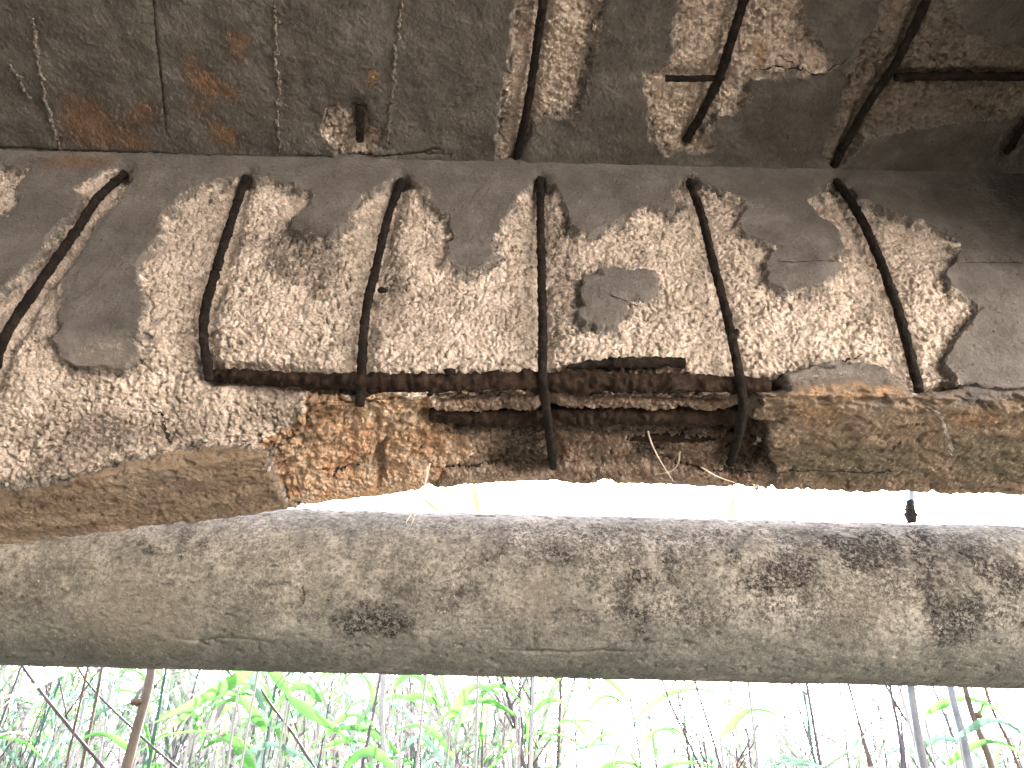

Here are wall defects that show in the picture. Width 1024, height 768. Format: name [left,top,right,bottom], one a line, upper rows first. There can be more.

spalling [494,0,609,161]
crack [752,55,848,76]
spalling [641,0,1024,168]
spalling [319,100,393,159]
spalling [0,163,983,507]
rust [791,383,903,423]
crack [611,442,901,475]